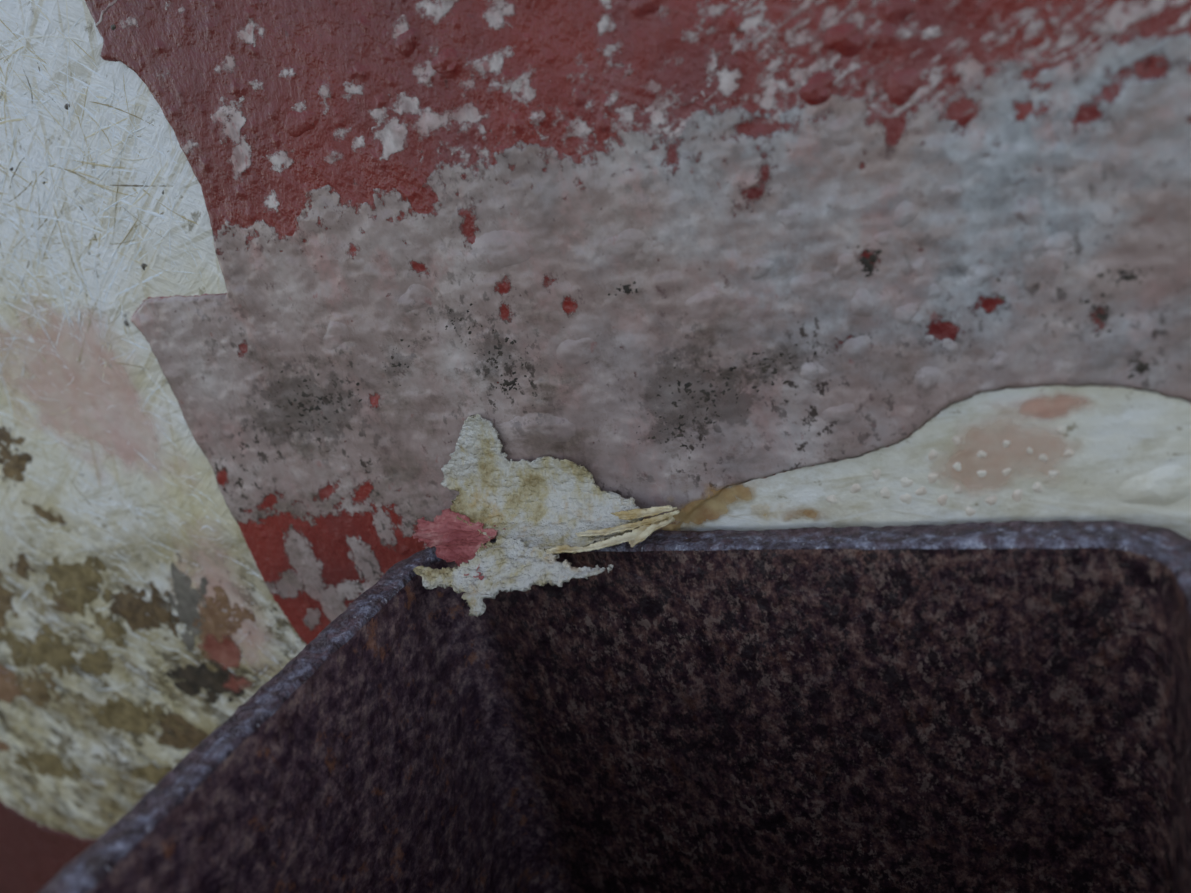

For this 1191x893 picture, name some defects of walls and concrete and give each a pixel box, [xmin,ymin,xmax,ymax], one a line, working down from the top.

crack [95,0,117,28]
peeling [0,0,384,841]
peeling [131,0,1191,617]